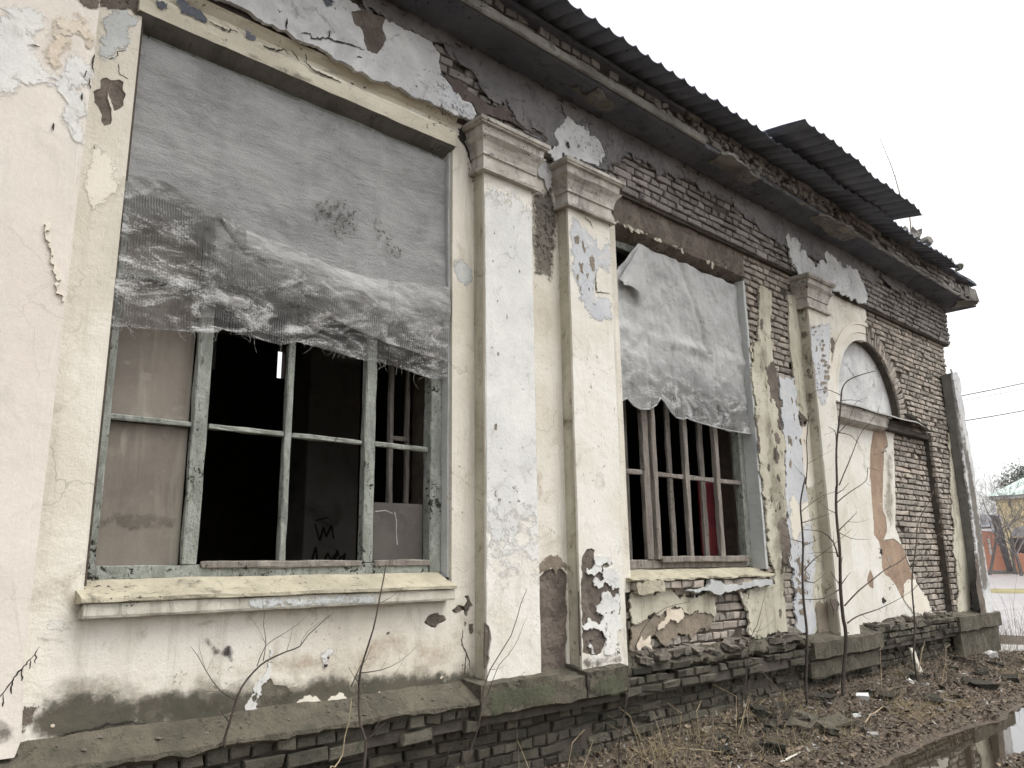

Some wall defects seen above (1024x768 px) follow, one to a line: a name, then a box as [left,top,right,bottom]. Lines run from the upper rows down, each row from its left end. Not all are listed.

peeling [156,0,208,24]
flaking render [351,7,385,54]
peeling [0,0,138,211]
peeling [439,74,605,190]
peeling [785,233,868,304]
peeling [453,187,716,670]
peeling [738,285,839,639]
flaking render [867,431,932,615]
flaking render [426,596,489,669]
leakage [34,668,474,737]
flaking render [245,648,347,710]